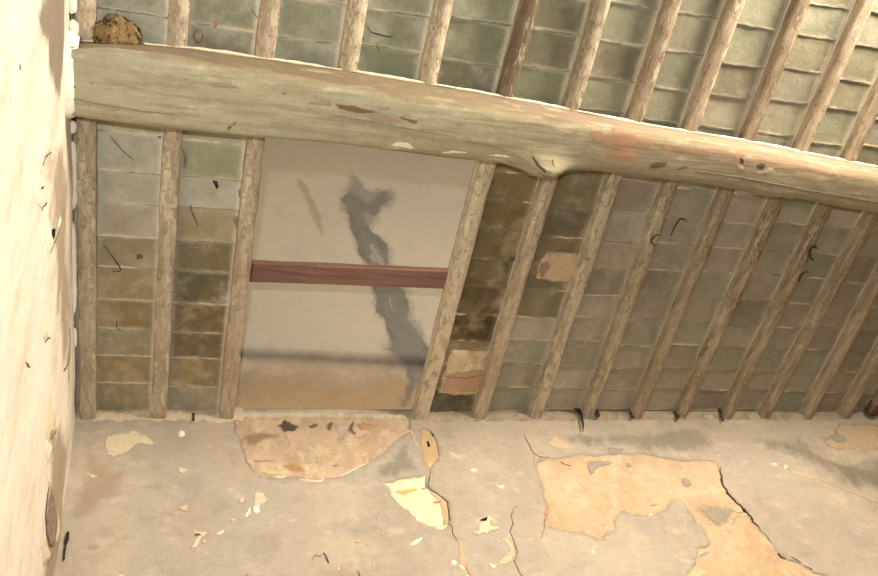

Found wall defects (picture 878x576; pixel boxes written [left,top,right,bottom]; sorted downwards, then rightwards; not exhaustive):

flaking render [46,216,62,254]
flaking render [536,252,578,282]
flaking render [438,350,488,395]
flaking render [234,412,461,530]
crack [510,509,522,576]
flaking render [536,434,822,576]
crack [719,467,814,570]